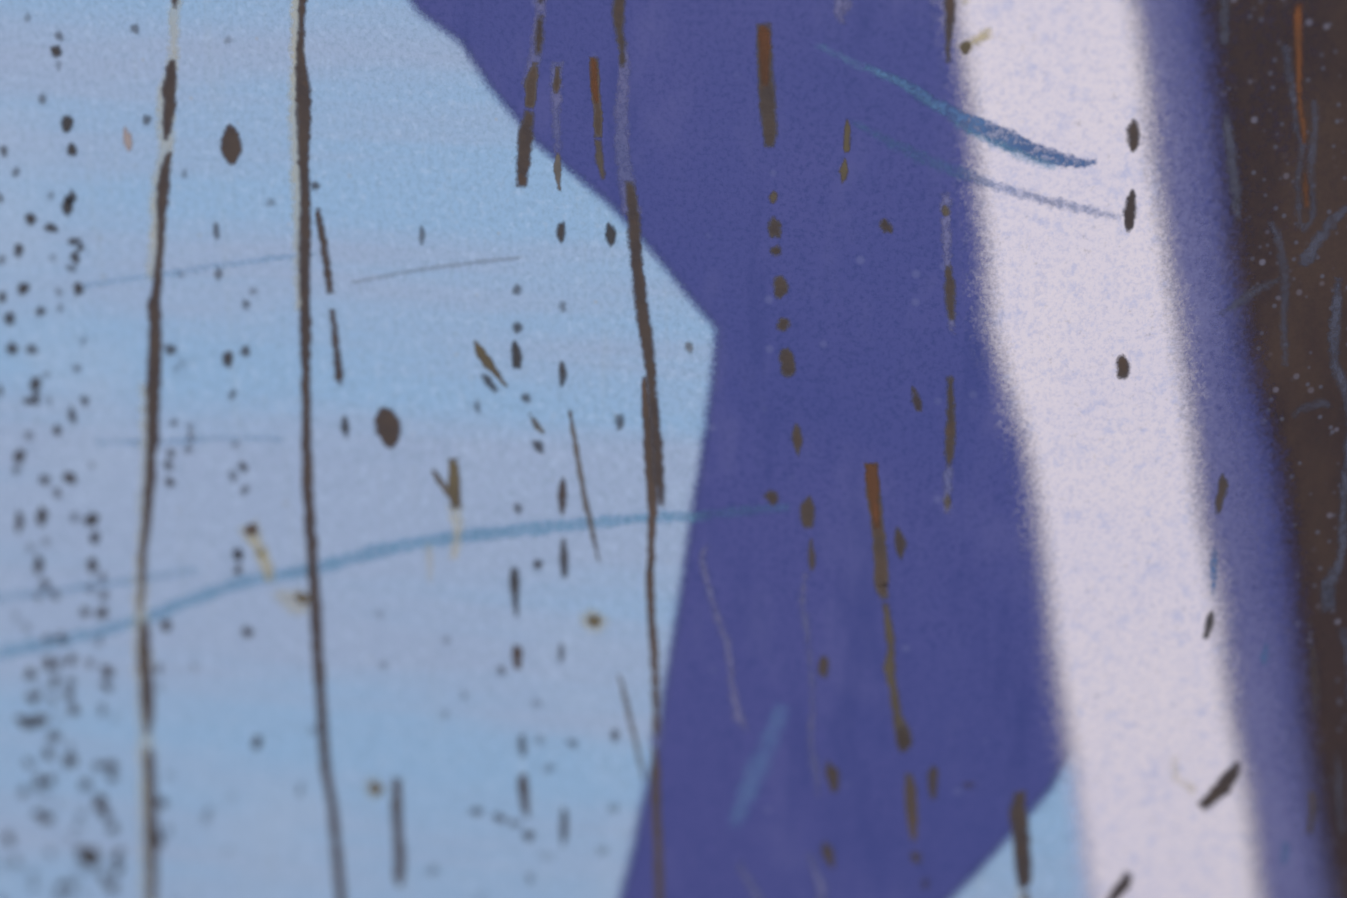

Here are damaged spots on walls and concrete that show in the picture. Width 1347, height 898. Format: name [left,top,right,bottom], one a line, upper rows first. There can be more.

corrosion [756,23,778,147]
corrosion [61,116,76,156]
corrosion [25,214,57,232]
corrosion [62,192,76,215]
corrosion [0,283,29,324]
corrosion [223,347,249,367]
corrosion [81,513,107,618]
corrosion [864,463,912,751]
corrosion [15,635,79,795]
corrosion [77,847,123,893]
corrosion [904,773,920,863]
corrosion [1009,790,1032,898]